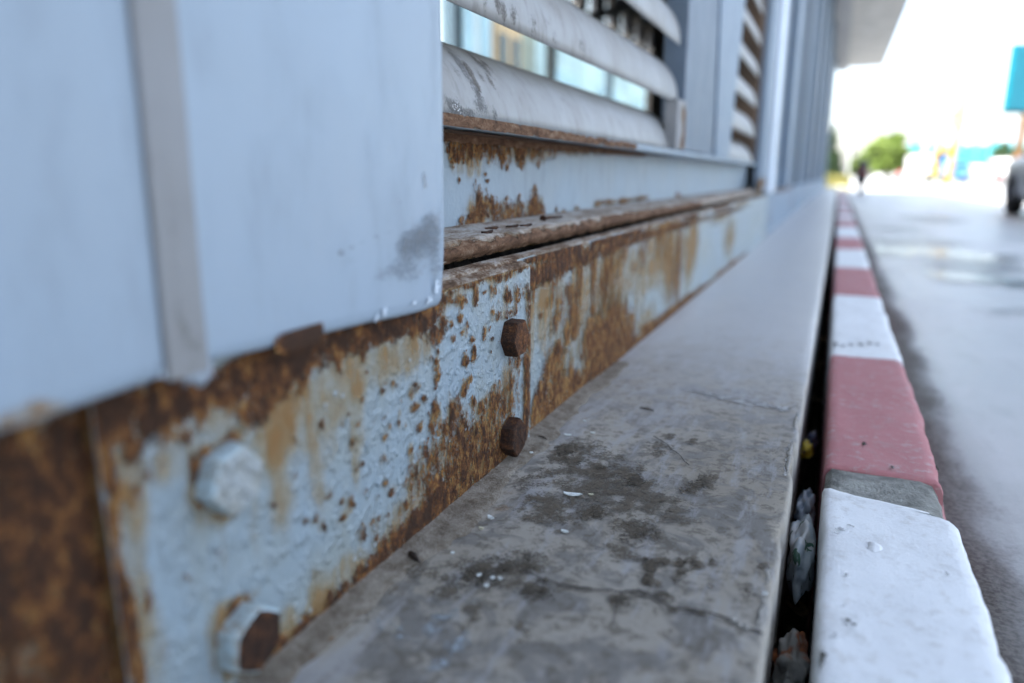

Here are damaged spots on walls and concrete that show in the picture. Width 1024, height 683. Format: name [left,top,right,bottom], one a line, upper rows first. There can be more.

corrosion [0,112,750,683]
water stain [452,553,555,602]
water stain [638,557,714,613]